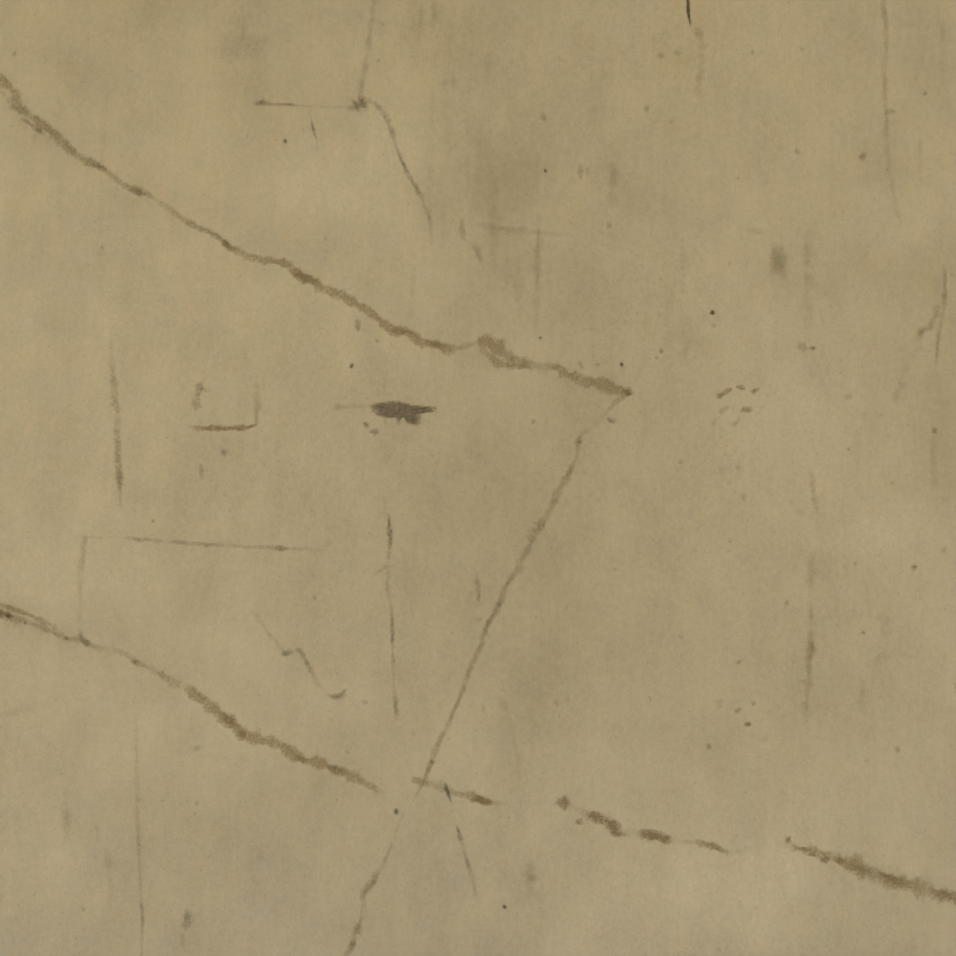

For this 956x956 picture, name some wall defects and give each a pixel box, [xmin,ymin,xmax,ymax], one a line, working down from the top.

crack [0,77,106,170]
crack [188,221,452,352]
crack [478,337,527,366]
crack [552,365,631,395]
crack [0,605,33,619]
crack [189,688,360,780]
crack [471,793,492,804]
crack [561,798,620,836]
crack [643,830,669,842]
crack [788,838,956,901]